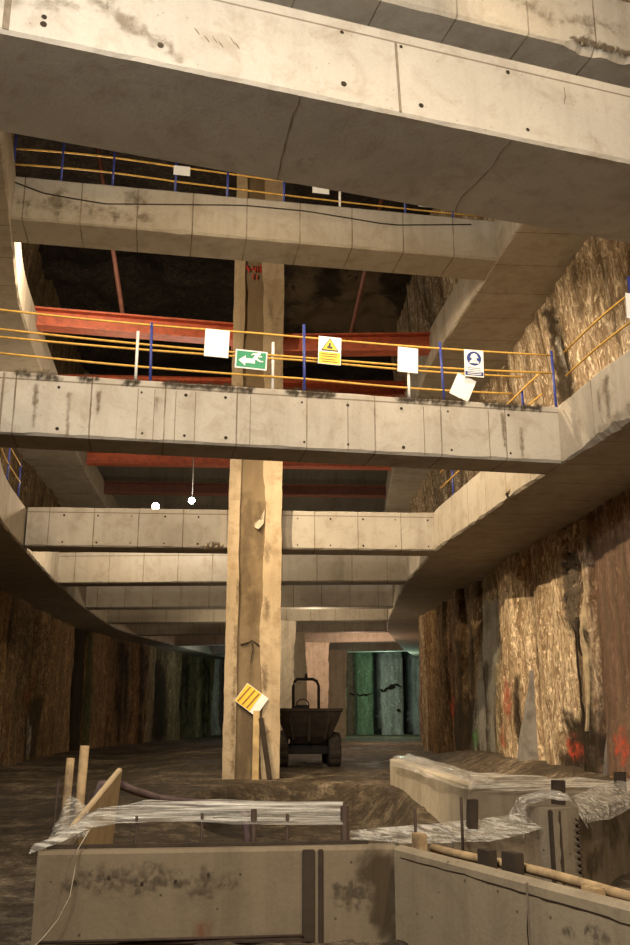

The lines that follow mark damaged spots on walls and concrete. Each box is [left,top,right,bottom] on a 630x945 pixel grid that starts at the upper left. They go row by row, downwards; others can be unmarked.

leakage [117,15,149,35]
spalling [571,36,630,55]
crack [350,683,402,712]